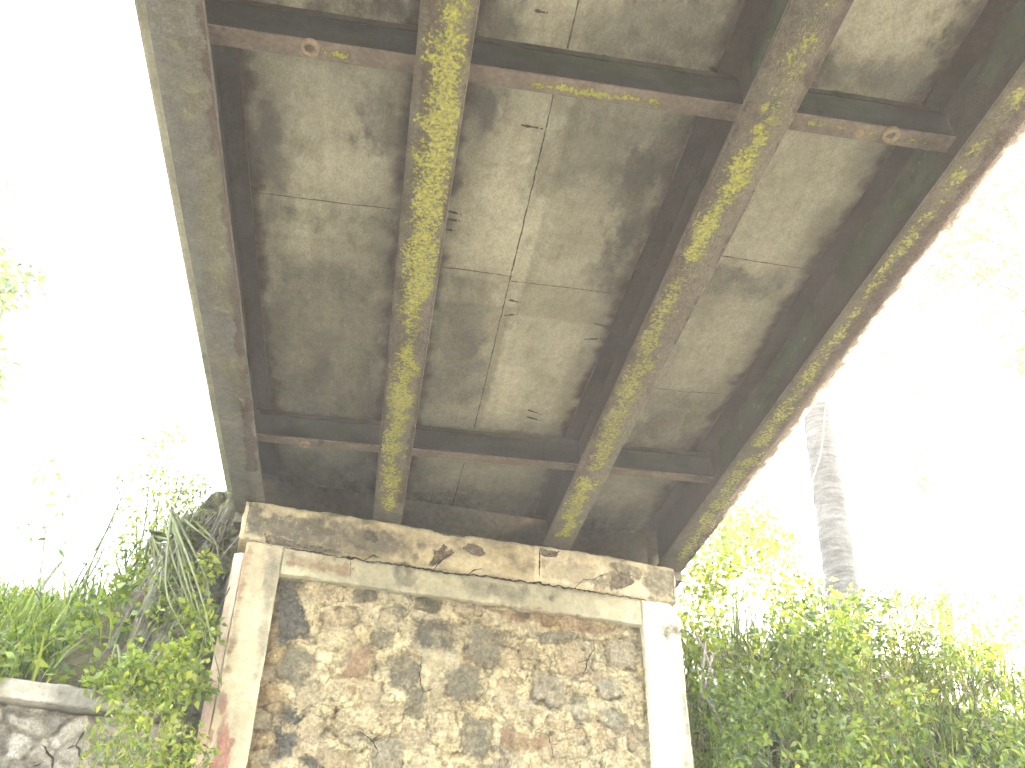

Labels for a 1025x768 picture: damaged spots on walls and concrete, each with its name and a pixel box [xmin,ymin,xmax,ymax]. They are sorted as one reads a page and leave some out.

corrosion [689,103,1025,561]
spalling [428,532,485,567]
crack [255,541,674,603]
spalling [610,571,635,590]